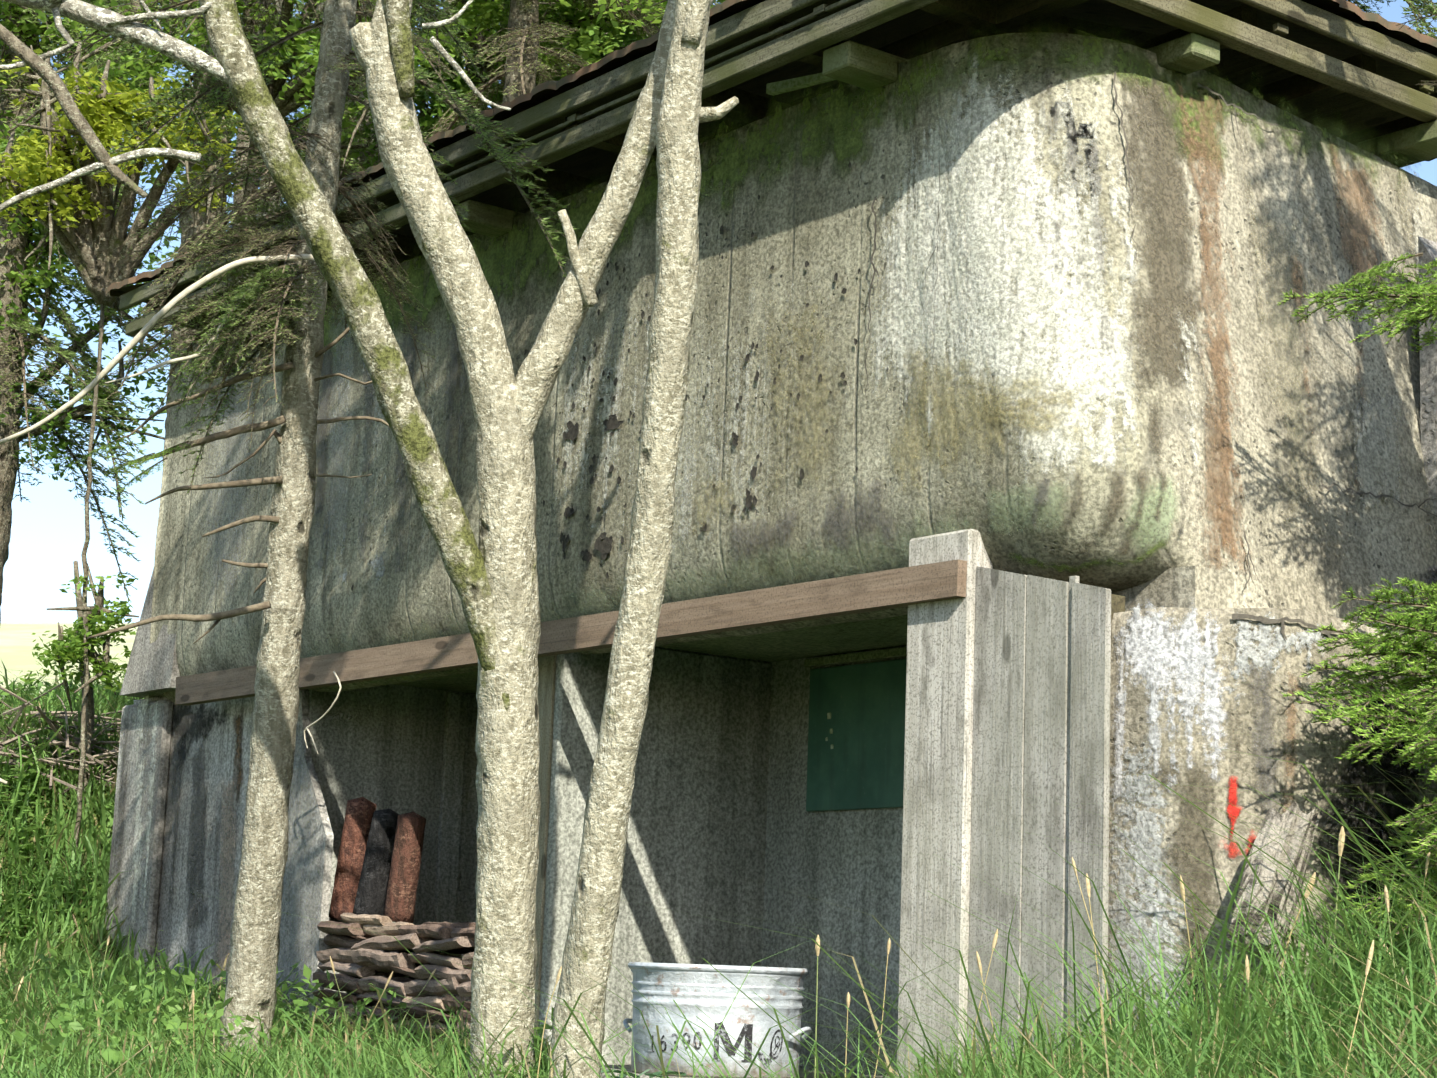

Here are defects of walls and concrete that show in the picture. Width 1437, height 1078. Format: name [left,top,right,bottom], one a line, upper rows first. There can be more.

damp [559,341,646,505]
damp [675,301,818,560]
damp [814,481,894,549]
damp [873,59,1201,573]
rust [1179,85,1245,568]
crack [1321,483,1437,517]
damp [114,695,227,943]
damp [1108,604,1322,1045]